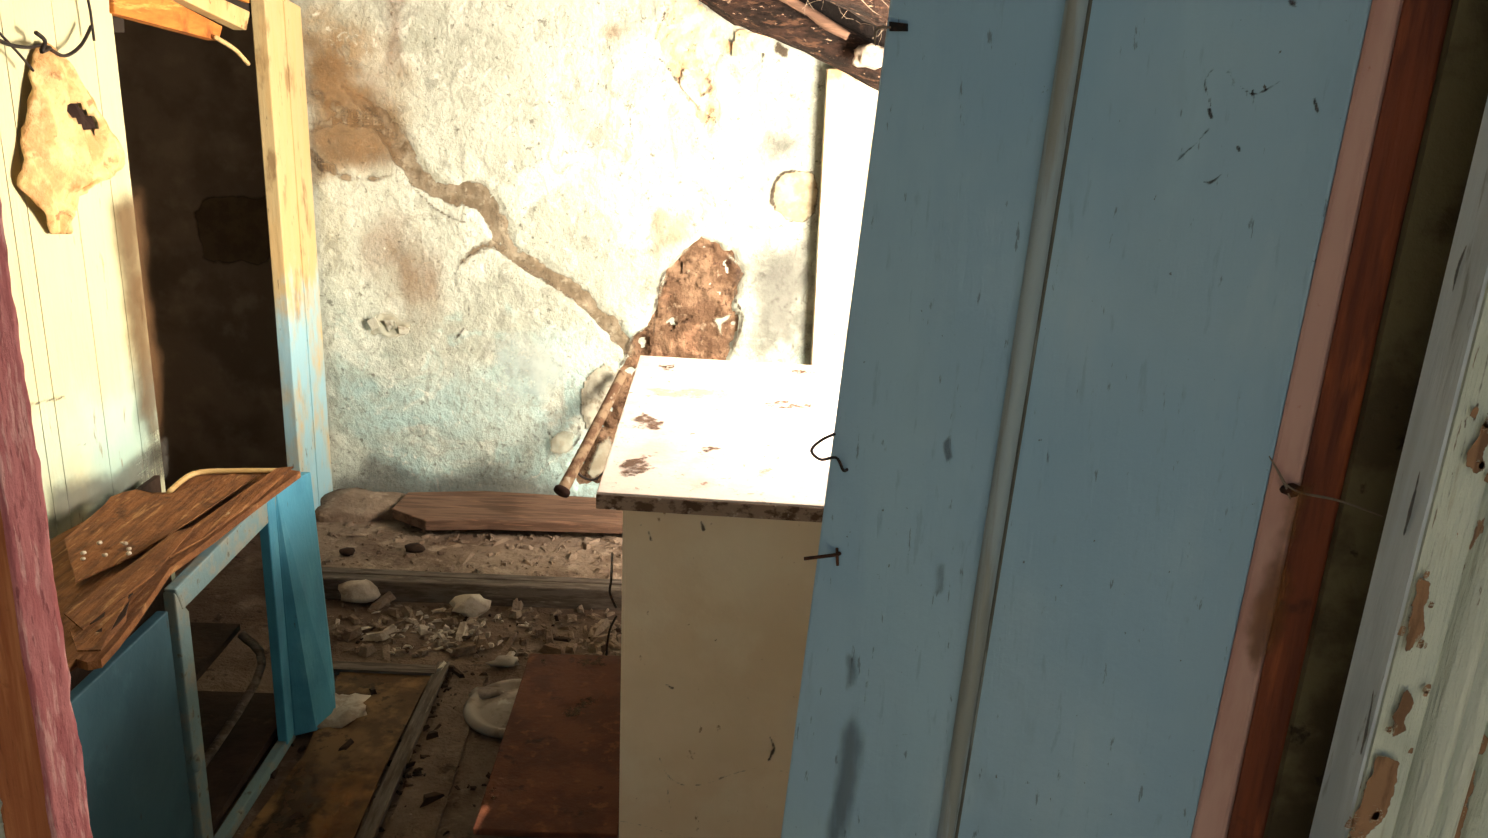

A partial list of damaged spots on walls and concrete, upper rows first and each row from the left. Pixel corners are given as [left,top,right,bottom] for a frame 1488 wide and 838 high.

spalling [654,0,788,131]
crack [310,90,633,356]
spalling [572,236,744,484]
peeling [1403,472,1420,535]
peeling [1466,407,1488,483]
peeling [1397,571,1434,652]
peeling [1345,684,1431,838]
peeling [1454,734,1488,838]